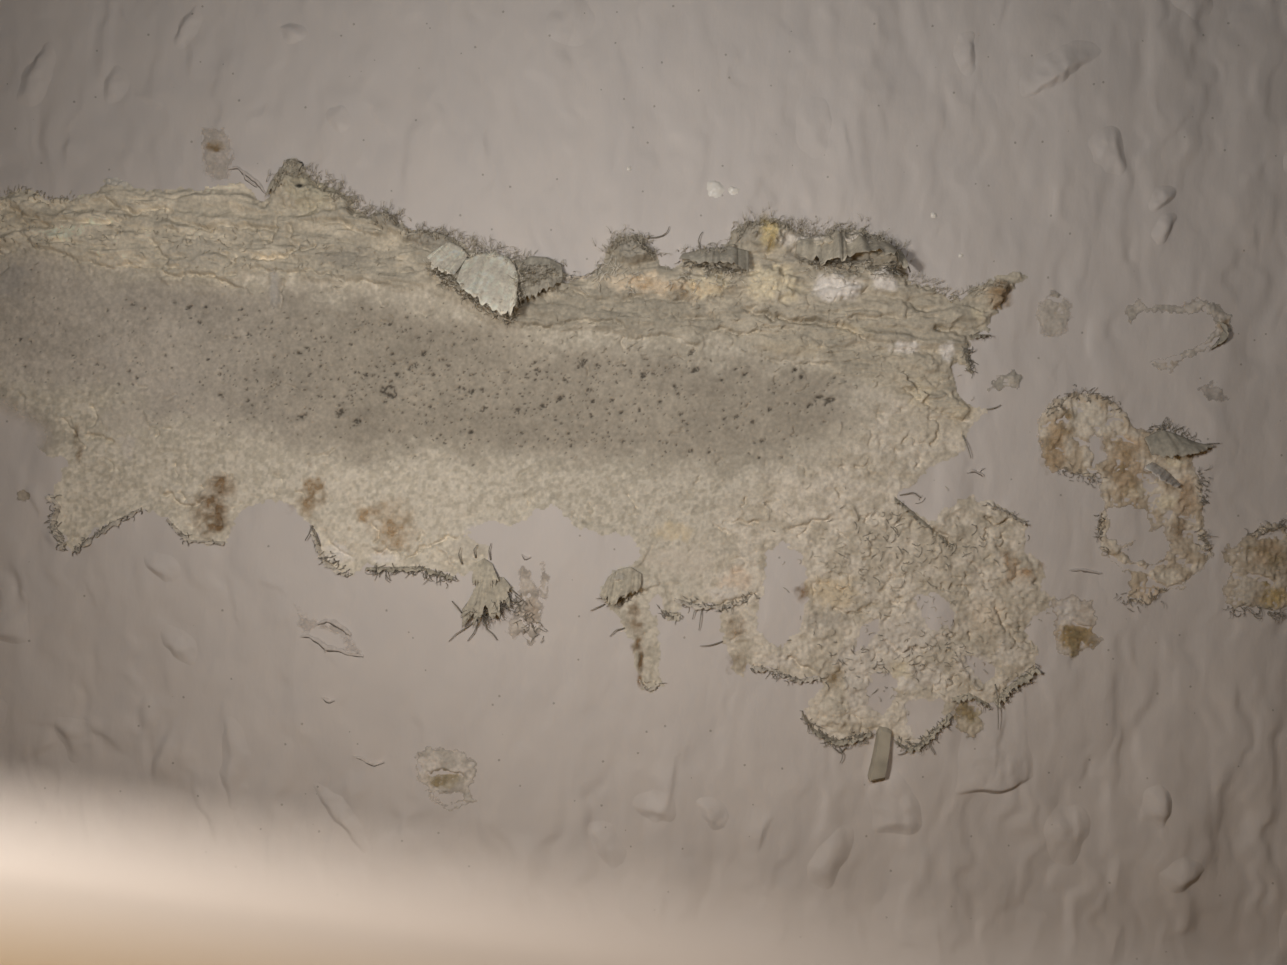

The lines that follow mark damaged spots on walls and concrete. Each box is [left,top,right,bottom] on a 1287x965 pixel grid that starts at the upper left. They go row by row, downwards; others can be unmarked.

peeling [0,129,1103,762]
peeling [1038,382,1287,623]
peeling [1126,298,1232,372]
peeling [416,747,477,811]